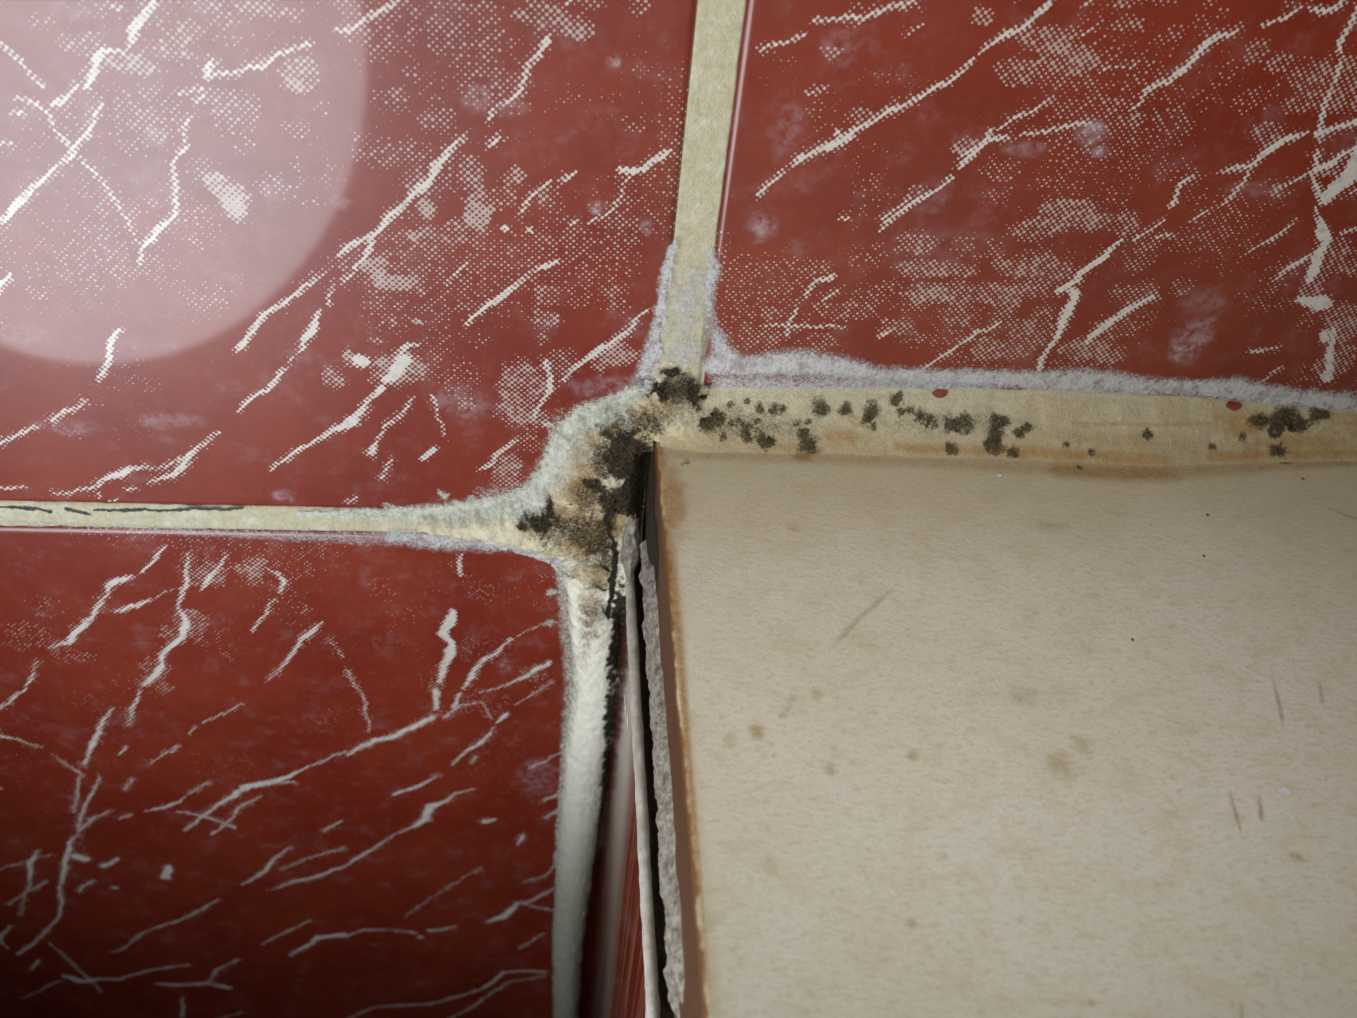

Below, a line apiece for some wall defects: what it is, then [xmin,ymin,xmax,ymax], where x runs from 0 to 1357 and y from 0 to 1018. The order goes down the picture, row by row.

damp [515,367,1033,867]
damp [1208,405,1330,464]